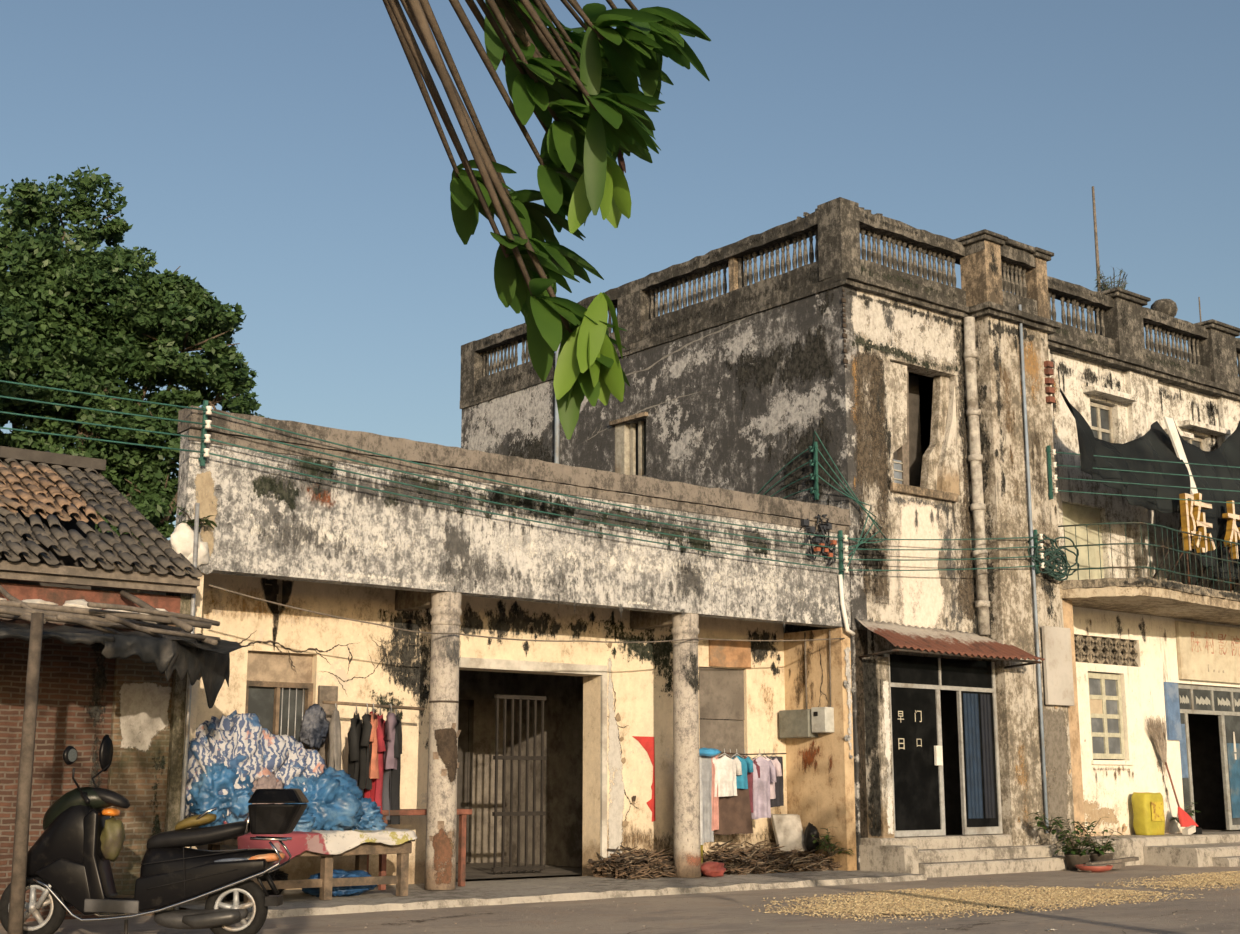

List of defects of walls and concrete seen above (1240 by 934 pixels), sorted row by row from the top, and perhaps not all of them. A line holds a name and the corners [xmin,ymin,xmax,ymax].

crack [239,631,386,692]
spalling [433,723,461,783]
water stain [207,451,819,749]
water stain [508,422,560,464]
water stain [641,268,1045,838]
water stain [1029,359,1123,620]